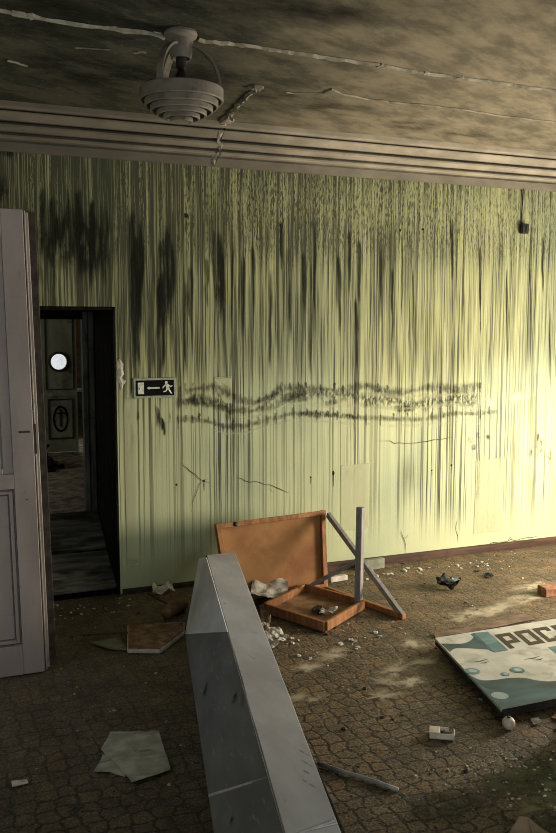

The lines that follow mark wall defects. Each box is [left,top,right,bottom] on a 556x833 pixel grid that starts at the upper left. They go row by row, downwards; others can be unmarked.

crack [0,9,165,54]
crack [197,38,556,93]
damp [68,193,109,280]
damp [130,216,144,357]
damp [157,228,175,364]
damp [205,236,255,355]
damp [302,231,317,369]
damp [338,232,362,367]
damp [380,252,414,336]
damp [179,382,490,432]
damp [487,758,556,831]